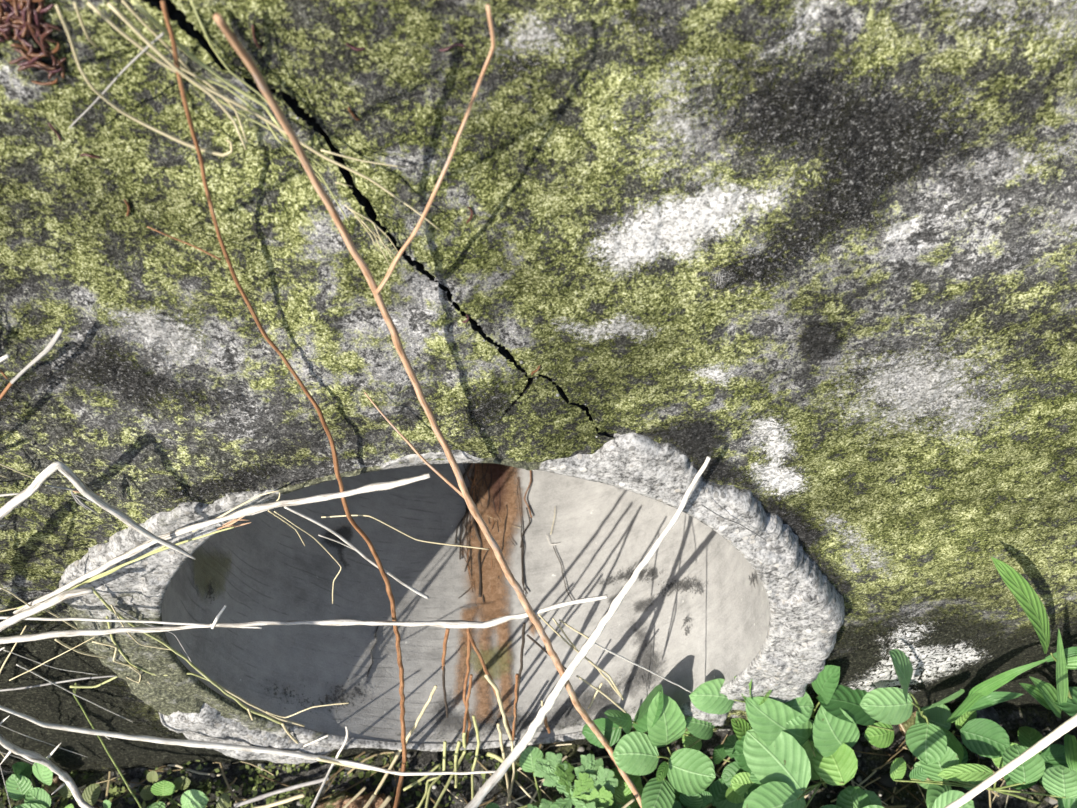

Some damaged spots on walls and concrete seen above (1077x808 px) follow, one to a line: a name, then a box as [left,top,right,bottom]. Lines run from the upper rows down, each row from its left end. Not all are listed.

crack [142,0,614,438]
rust [454,463,520,719]